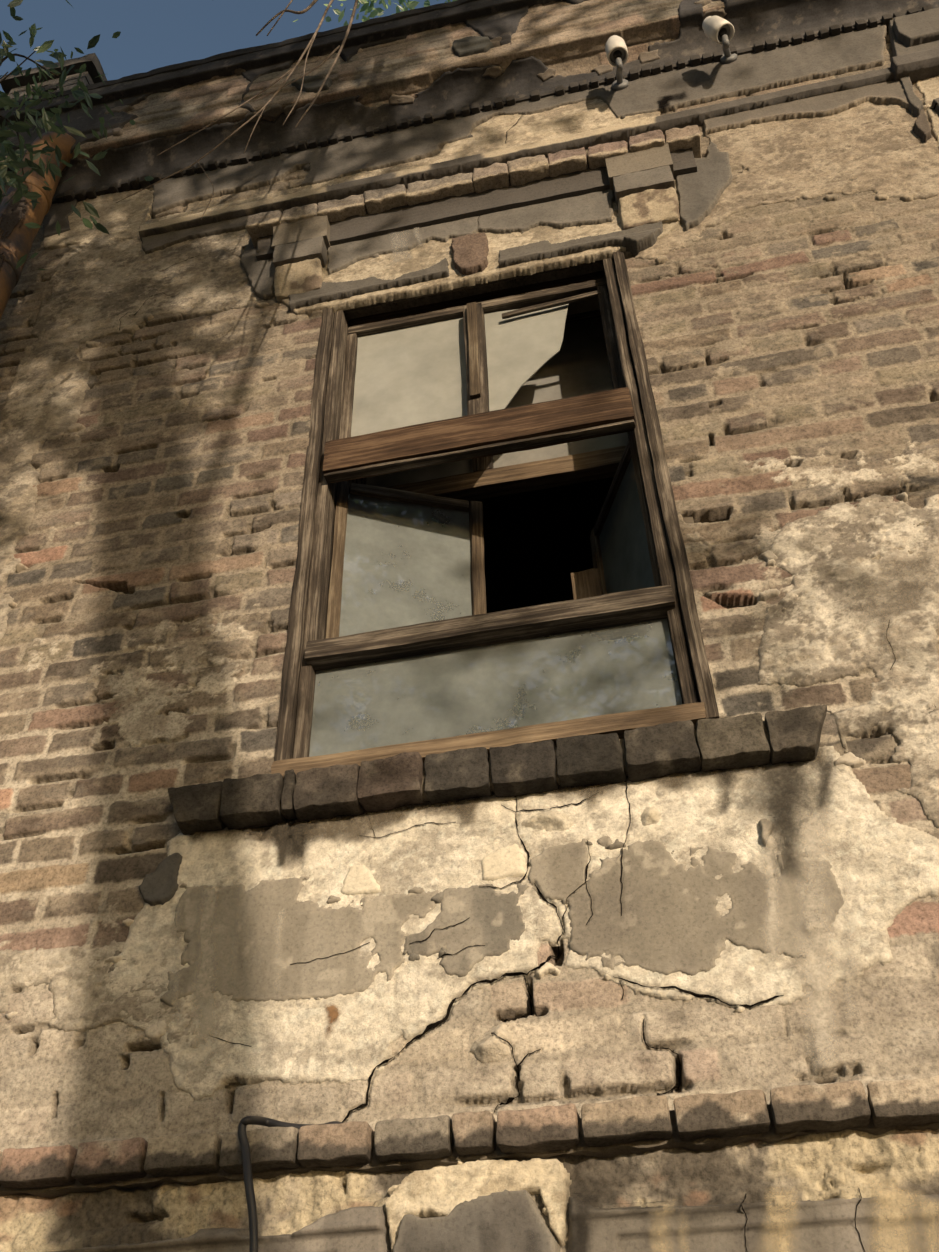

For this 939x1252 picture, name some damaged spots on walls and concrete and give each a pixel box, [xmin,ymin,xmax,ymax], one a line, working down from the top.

peeling [0,0,939,640]
leakage [191,792,493,865]
flaking render [0,492,939,1101]
leakage [541,776,629,801]
crack [290,942,370,965]
crack [342,783,631,1123]
leakage [656,748,832,1058]
crack [613,976,784,1096]
flaking render [385,1157,572,1252]